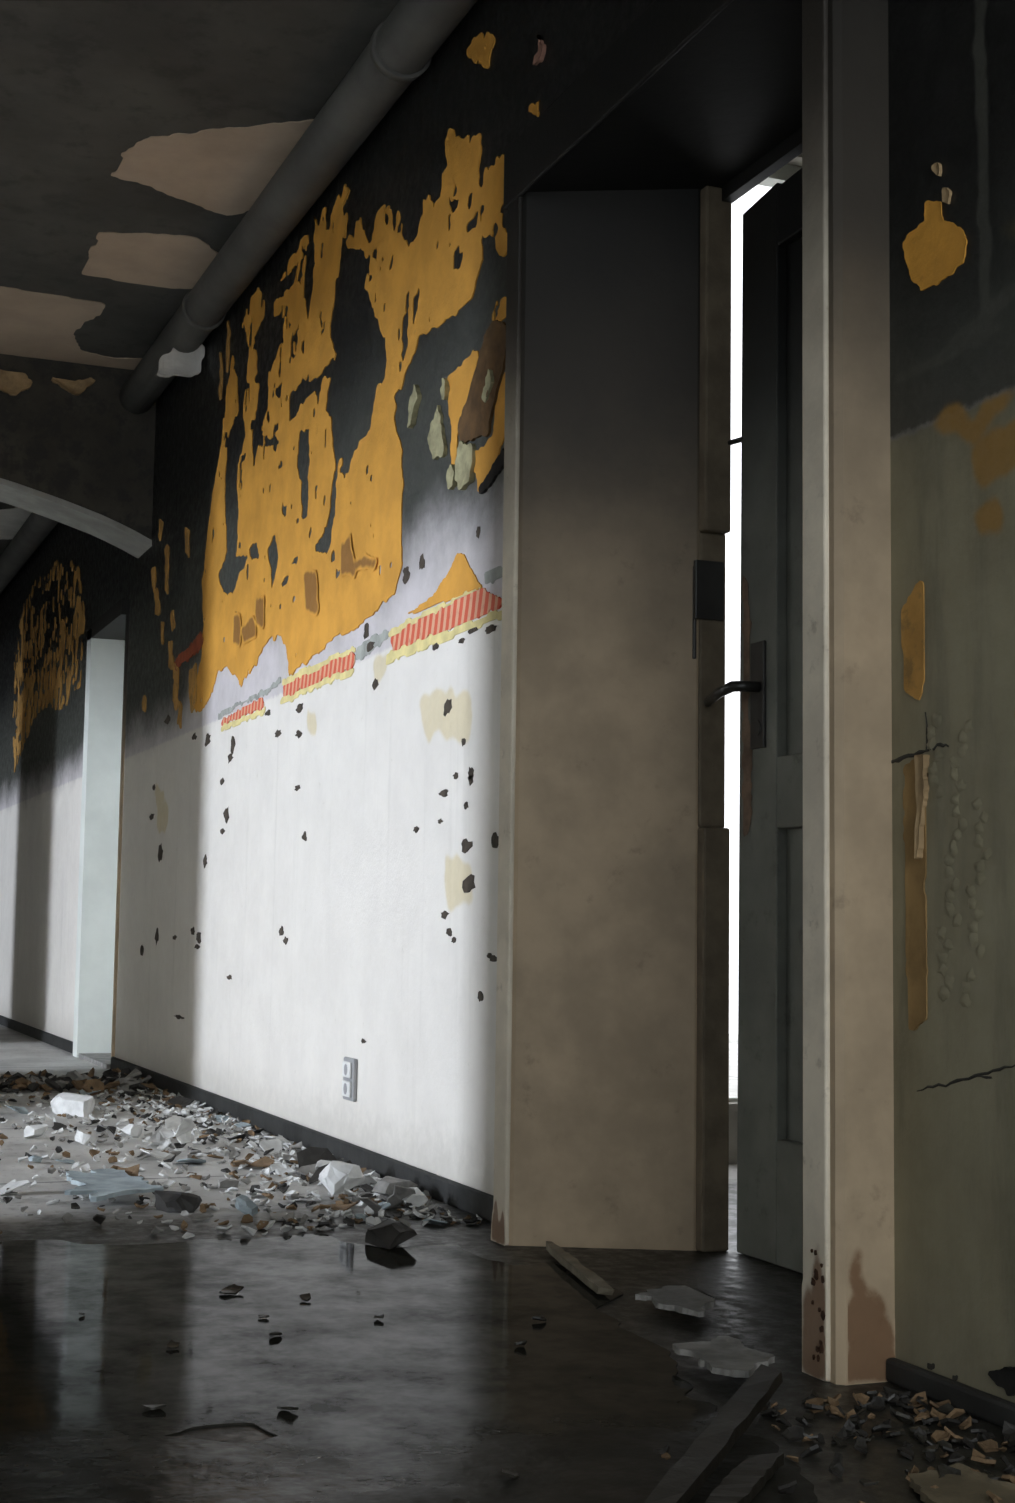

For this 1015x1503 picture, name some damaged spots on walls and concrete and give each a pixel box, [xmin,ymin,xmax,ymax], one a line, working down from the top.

peeling [467,32,495,69]
peeling [528,100,541,117]
peeling [903,162,968,291]
peeling [0,119,507,772]
peeling [220,736,235,785]
peeling [438,767,474,810]
peeling [461,839,473,853]
peeling [491,832,499,848]
peeling [462,874,475,893]
peeling [140,927,201,956]
peeling [441,910,456,943]